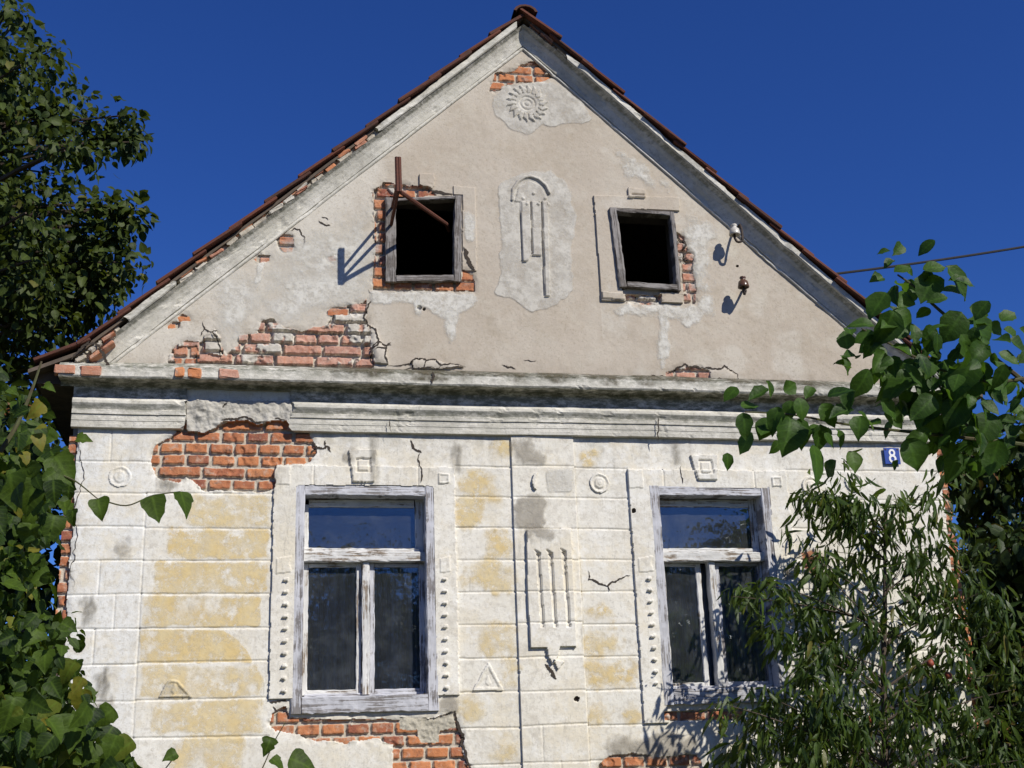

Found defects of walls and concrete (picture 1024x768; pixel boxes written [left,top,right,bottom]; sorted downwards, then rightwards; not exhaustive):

spalling [489,61,553,92]
spalling [168,182,475,369]
spalling [676,232,697,304]
spalling [666,366,711,378]
spalling [68,435,78,465]
crack [389,420,423,481]
spalling [56,515,74,620]
spalling [140,399,482,768]
crack [588,571,630,591]